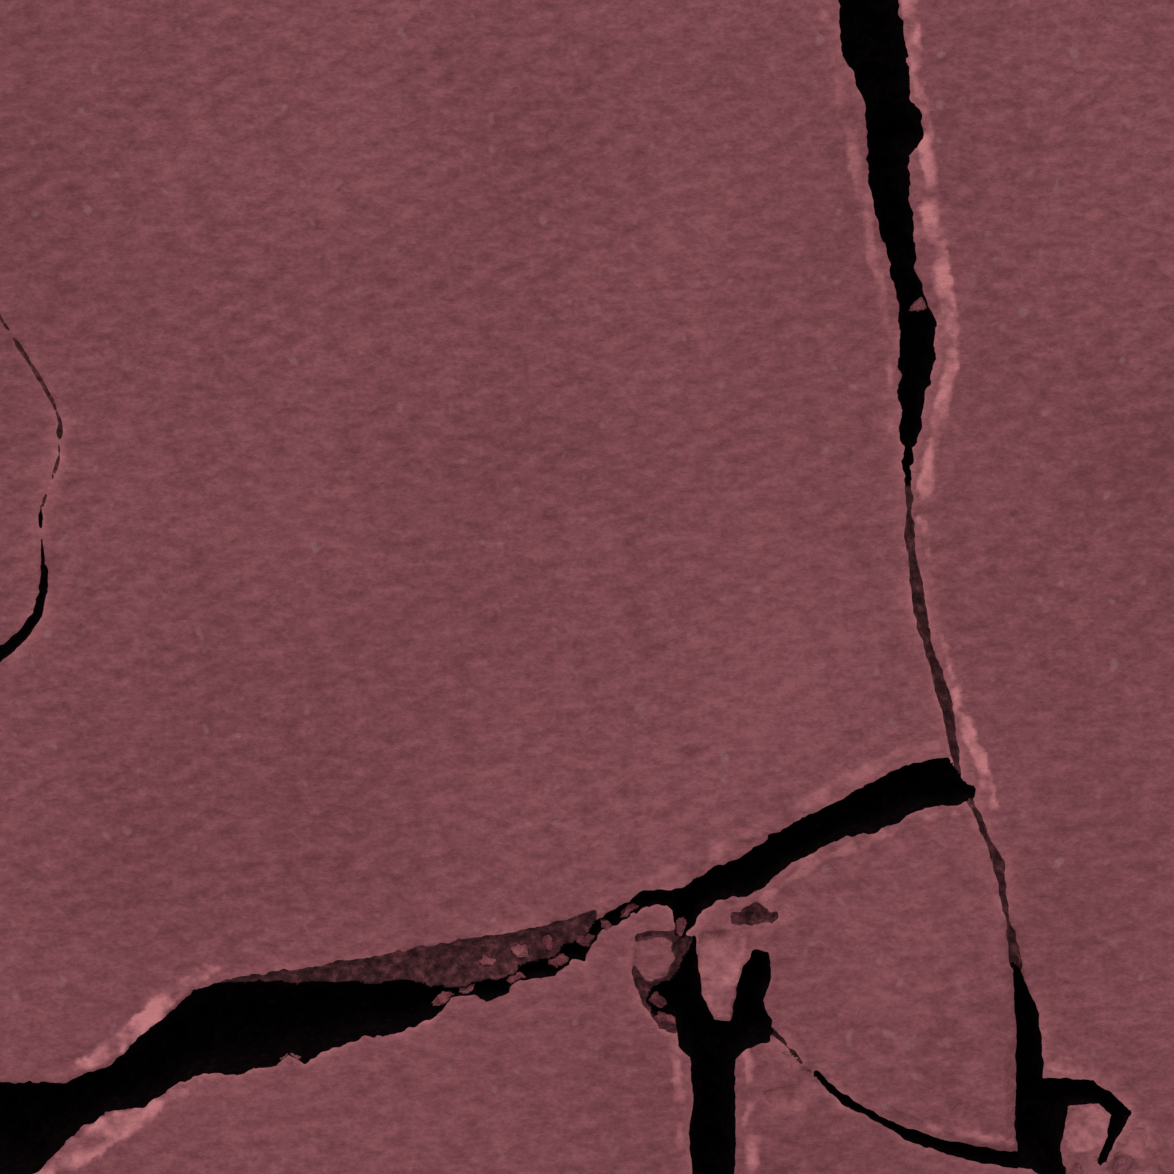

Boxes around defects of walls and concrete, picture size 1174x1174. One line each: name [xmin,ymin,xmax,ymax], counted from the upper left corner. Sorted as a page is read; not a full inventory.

crack [0,315,63,662]
crack [815,0,1001,826]
crack [0,738,1162,1174]